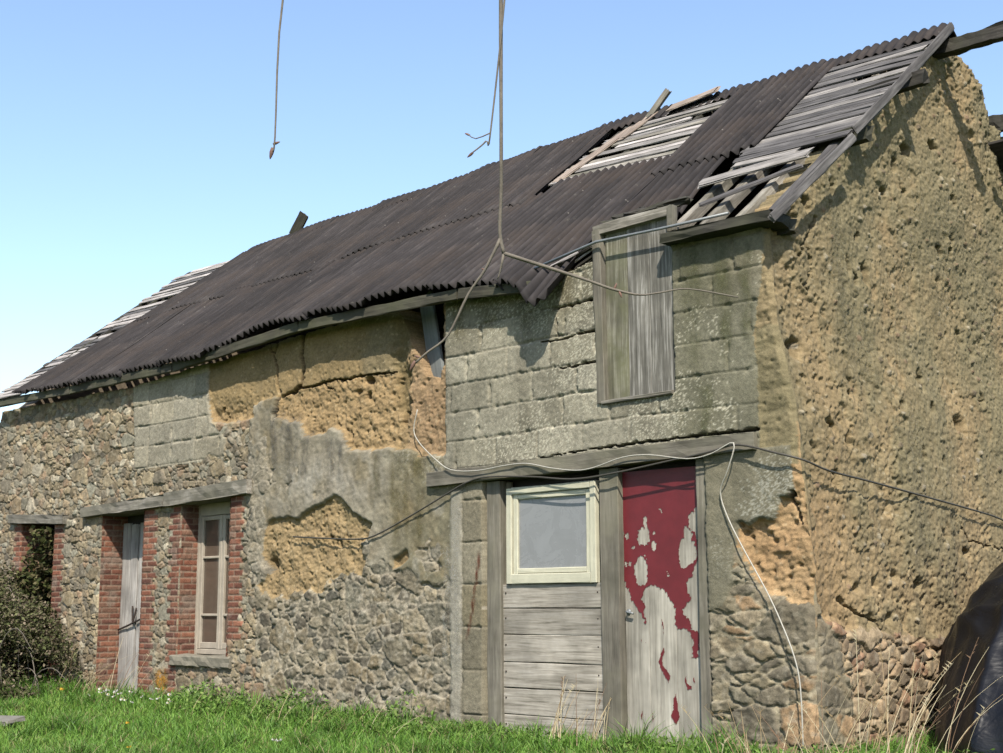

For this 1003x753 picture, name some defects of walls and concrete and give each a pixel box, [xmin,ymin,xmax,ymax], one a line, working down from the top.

crack [274,335,398,414]
spalling [259,495,372,600]
spalling [393,549,409,569]
peeling [622,466,699,658]
spalling [737,463,816,604]
peeling [658,648,670,683]
peeling [671,694,680,724]